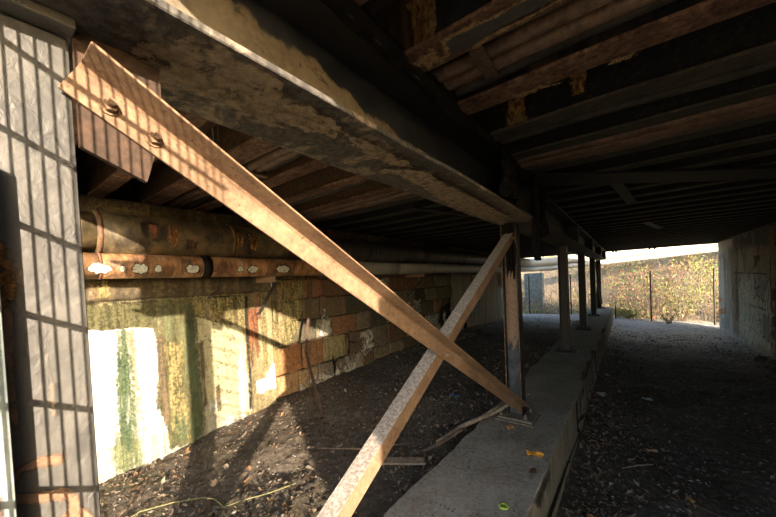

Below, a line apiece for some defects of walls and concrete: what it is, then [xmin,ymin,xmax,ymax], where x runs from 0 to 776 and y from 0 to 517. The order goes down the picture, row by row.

peeling [129,37,510,225]
peeling [404,0,563,70]
peeling [506,70,587,126]
damp [86,294,245,472]